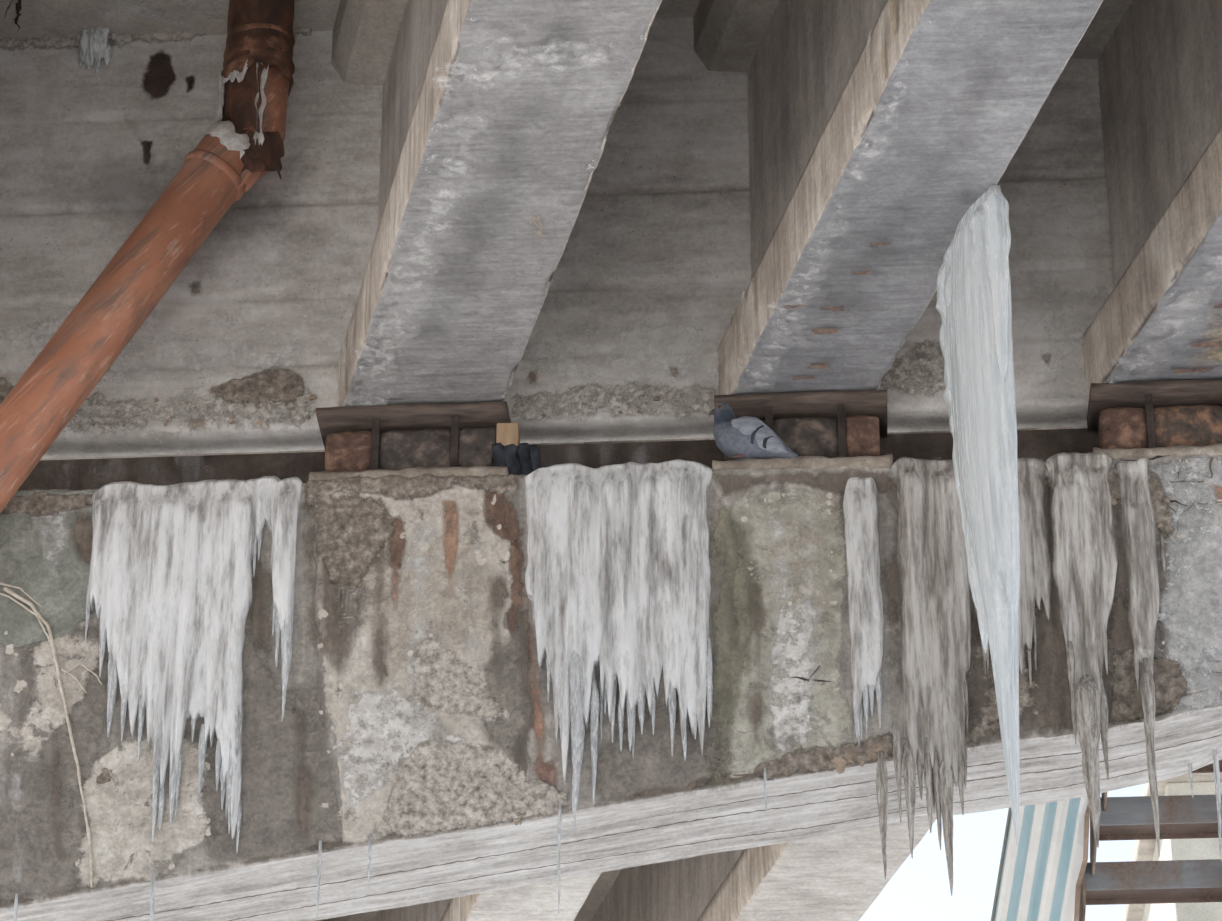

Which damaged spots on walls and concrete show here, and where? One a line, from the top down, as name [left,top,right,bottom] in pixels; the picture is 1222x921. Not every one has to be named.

rust [221,59,284,180]
spalling [0,378,13,404]
spalling [67,368,316,440]
spalling [501,382,715,421]
spalling [881,340,945,396]
crack [1120,455,1222,544]
rust [388,517,405,602]
rust [443,502,458,571]